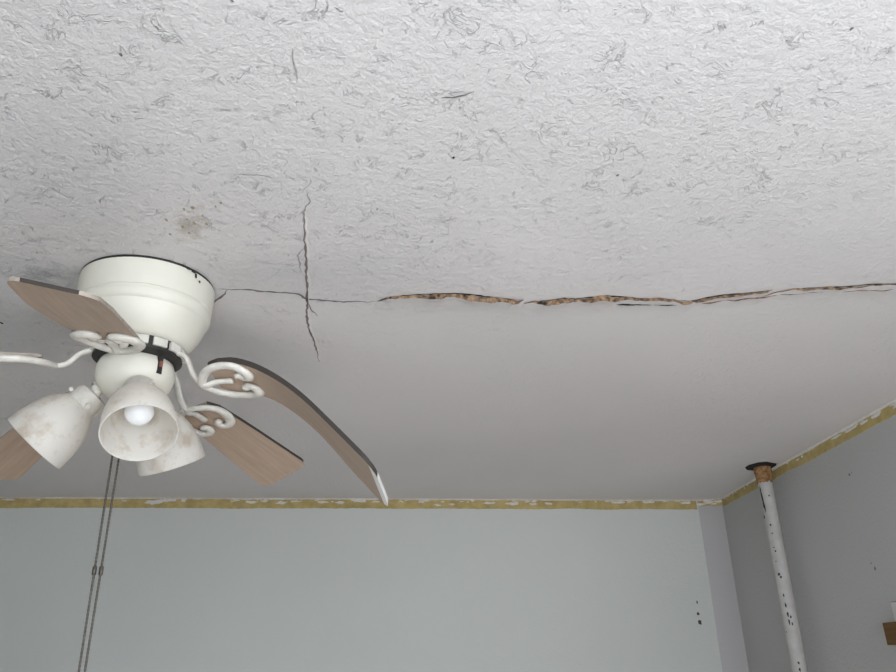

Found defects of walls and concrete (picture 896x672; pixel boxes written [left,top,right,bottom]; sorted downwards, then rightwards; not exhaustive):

crack [214,190,896,362]
peeling [772,399,896,480]
peeling [0,478,773,534]